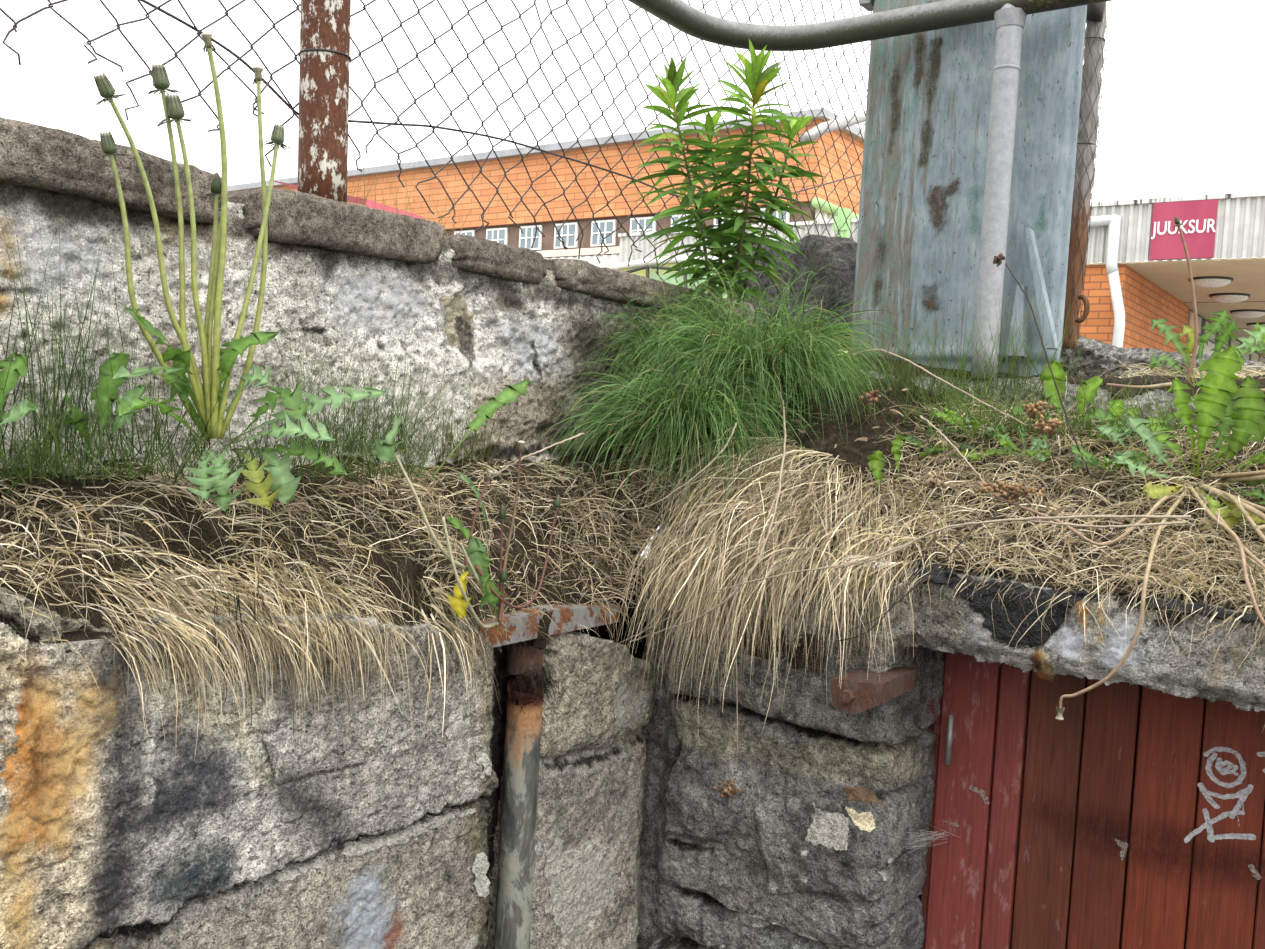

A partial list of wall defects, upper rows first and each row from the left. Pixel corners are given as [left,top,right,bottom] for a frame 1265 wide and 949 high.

leakage [890,69,900,150]
leakage [914,34,942,166]
leakage [875,239,885,304]
corrosion [478,602,620,648]
spalling [995,653,1035,668]
spalling [1050,663,1199,696]
corrosion [0,682,97,949]